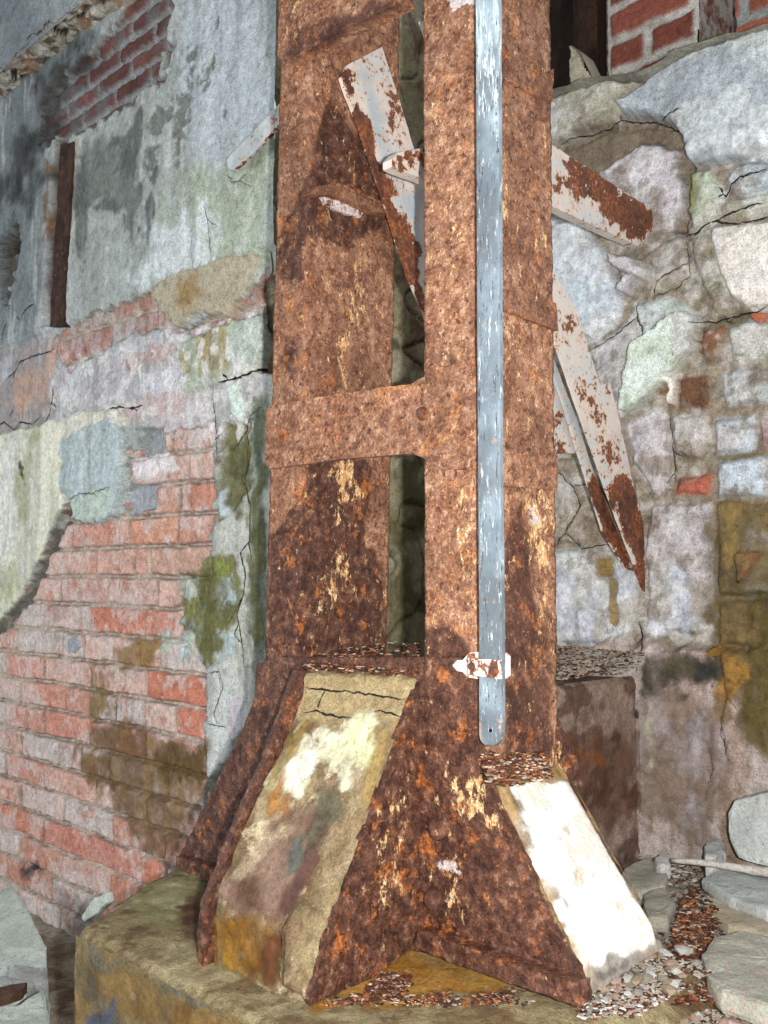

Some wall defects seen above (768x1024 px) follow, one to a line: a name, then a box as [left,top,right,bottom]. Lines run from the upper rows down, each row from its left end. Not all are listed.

flaking render [0,0,175,142]
water stain [72,107,159,252]
crack [560,108,680,146]
flaking render [58,252,270,372]
crack [213,368,269,664]
flaking render [0,423,218,939]
water stain [73,674,208,859]
water stain [113,630,200,670]
crack [304,687,404,719]
rust [362,727,389,805]
rust [214,770,329,992]
rust [311,950,552,1013]